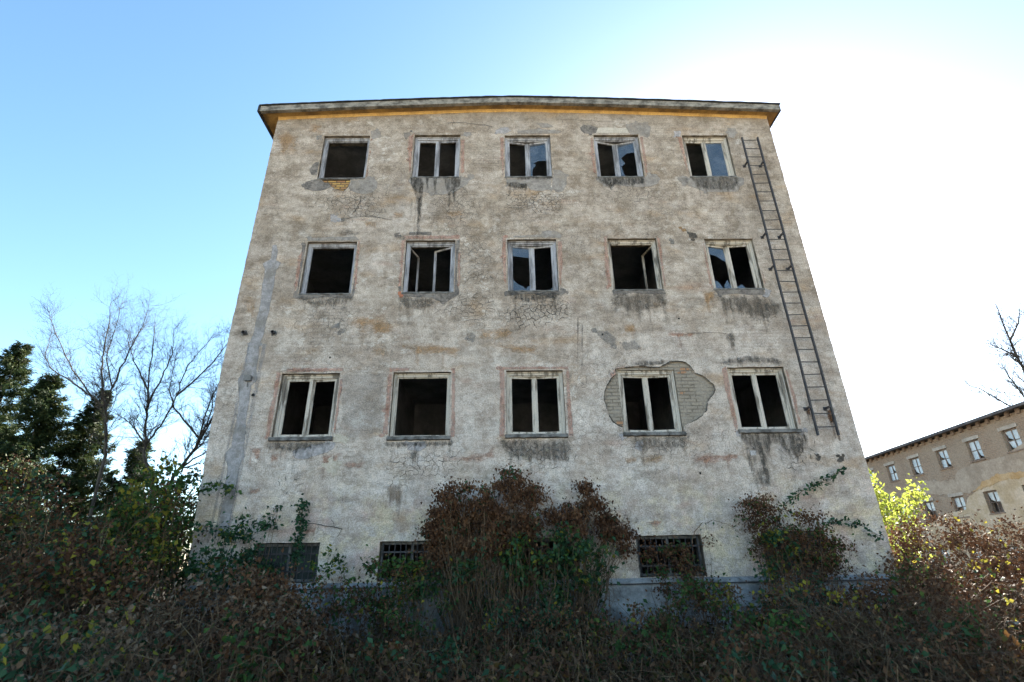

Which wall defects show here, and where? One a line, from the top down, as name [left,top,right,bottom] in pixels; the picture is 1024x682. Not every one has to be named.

flaking render [322,180,350,191]
water stain [411,178,461,222]
crack [420,186,570,330]
water stain [615,294,666,310]
flaking render [604,361,716,432]
crack [386,446,461,486]
water stain [501,440,570,461]
water stain [741,433,806,484]